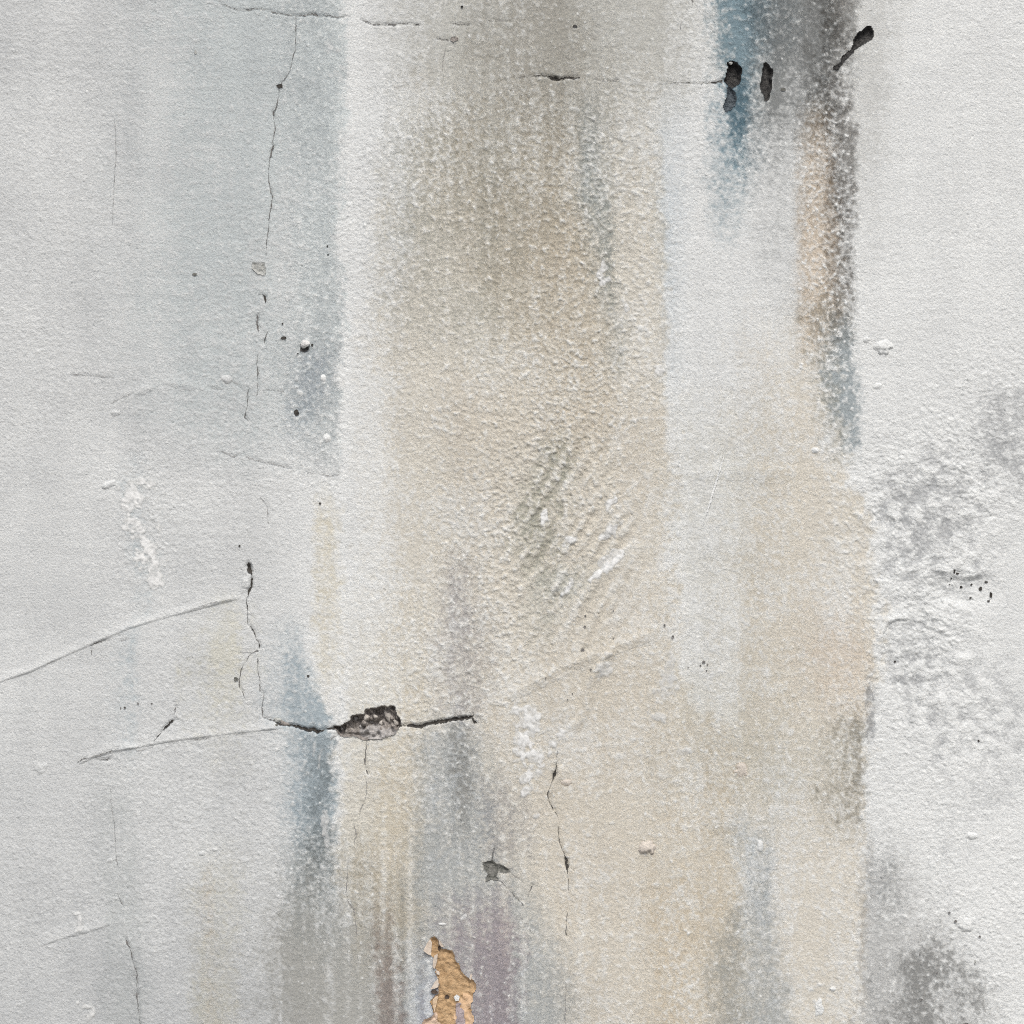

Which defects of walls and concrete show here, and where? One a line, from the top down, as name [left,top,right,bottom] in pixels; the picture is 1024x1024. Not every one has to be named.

crack [224,4,503,254]
leakage [719,0,754,127]
leakage [763,0,857,166]
crack [211,295,284,419]
crack [201,562,339,739]
flaking render [333,706,401,740]
crack [399,714,477,728]
flaking render [483,860,510,881]
crack [547,751,569,935]
peeling [422,923,476,1024]